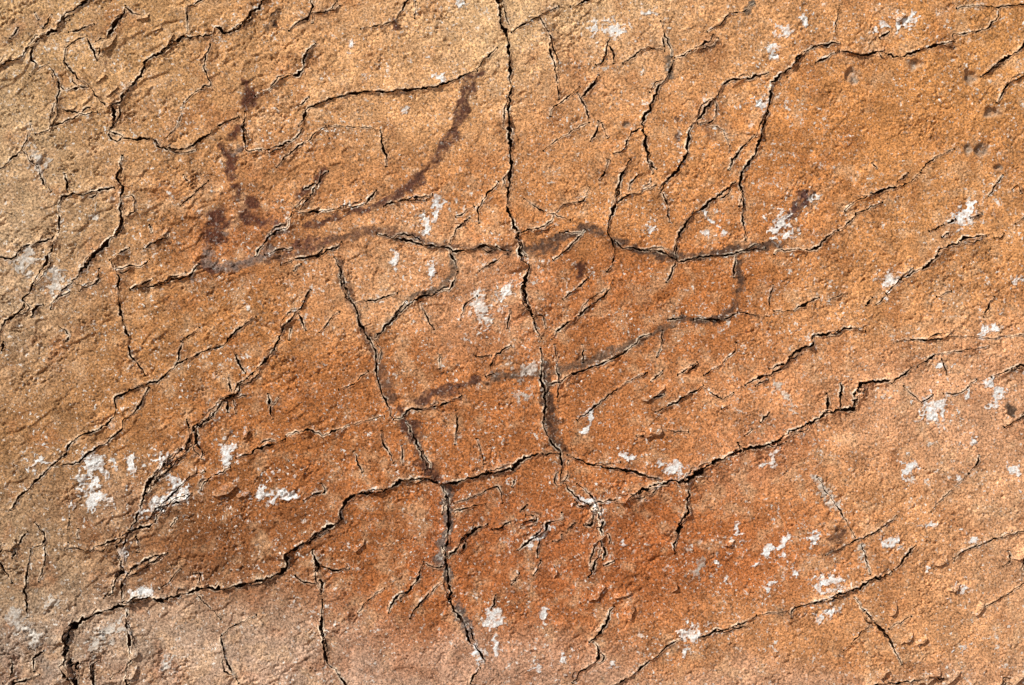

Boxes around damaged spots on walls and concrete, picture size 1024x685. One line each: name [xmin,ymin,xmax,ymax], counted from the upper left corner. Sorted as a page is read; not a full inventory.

crack [0,0,498,192]
crack [596,2,1024,282]
crack [254,167,377,272]
crack [333,0,600,421]
crack [865,212,1024,306]
crack [0,156,257,510]
crack [897,329,1024,375]
crack [992,362,1024,378]
crack [57,277,947,685]
crack [0,521,49,617]
crack [952,529,1024,615]
crack [2,650,45,685]